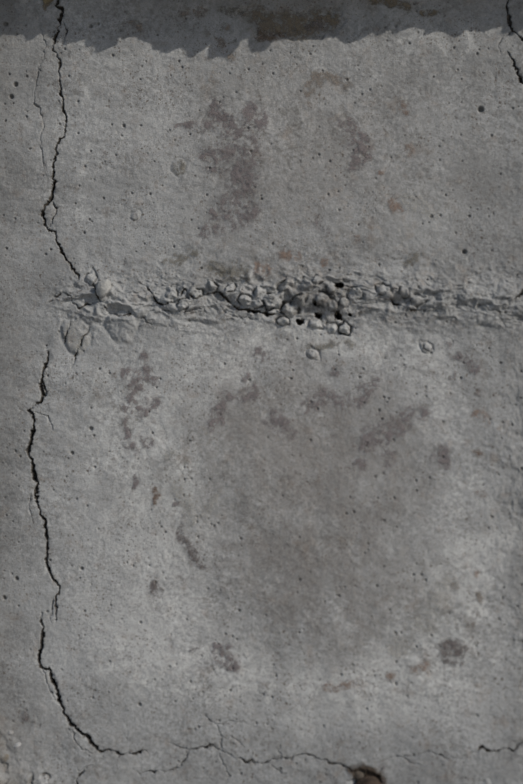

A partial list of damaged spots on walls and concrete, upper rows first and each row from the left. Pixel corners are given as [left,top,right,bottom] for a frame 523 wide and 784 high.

crack [506,0,523,84]
crack [41,0,147,323]
crack [147,288,283,317]
crack [27,332,142,755]
corrosion [347,763,386,784]
crack [478,744,518,752]